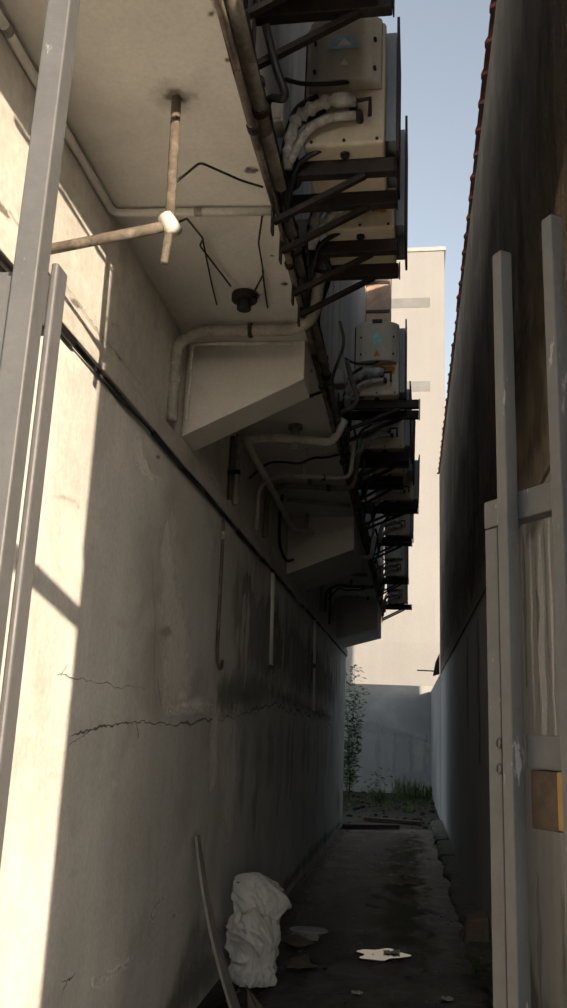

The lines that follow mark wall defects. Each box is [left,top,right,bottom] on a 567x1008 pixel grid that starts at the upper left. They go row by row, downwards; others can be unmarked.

water stain [441,0,567,764]
crack [57,648,330,752]
water stain [210,563,339,835]